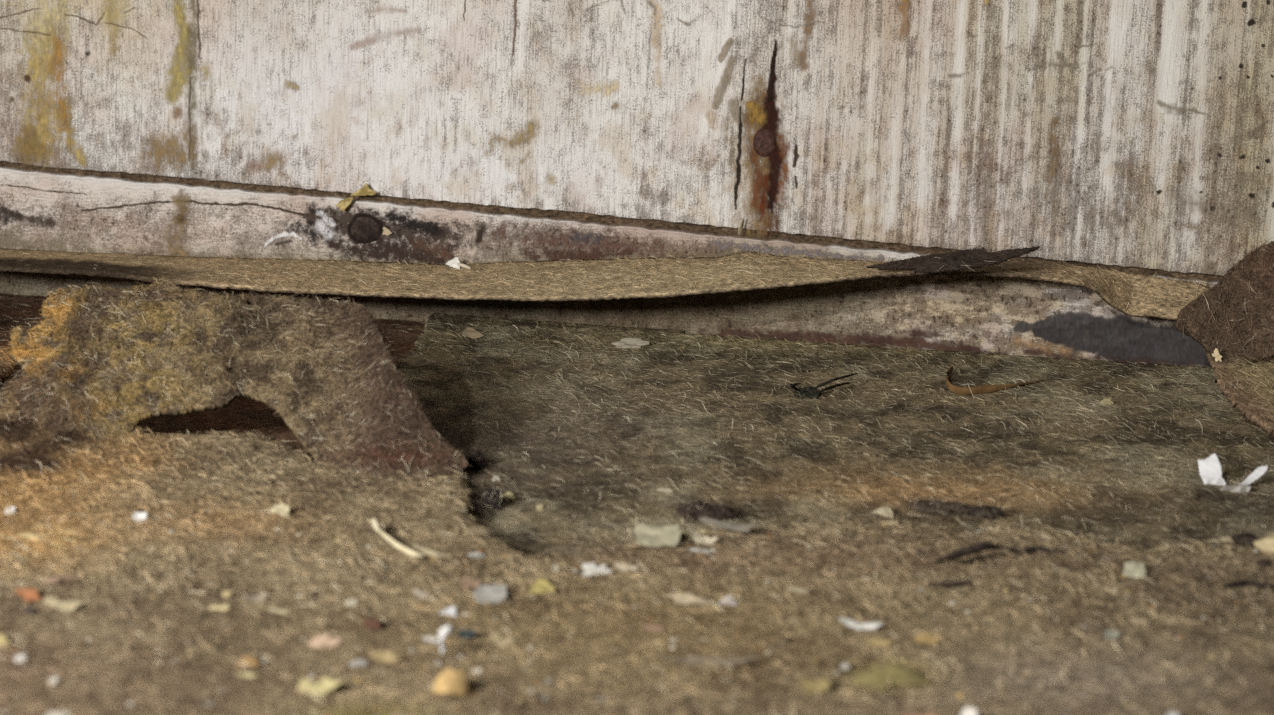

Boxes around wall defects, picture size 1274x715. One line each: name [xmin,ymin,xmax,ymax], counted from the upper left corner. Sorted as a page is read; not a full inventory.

rust [733,51,789,234]
peeling [696,329,1006,354]
peeling [1190,348,1222,368]